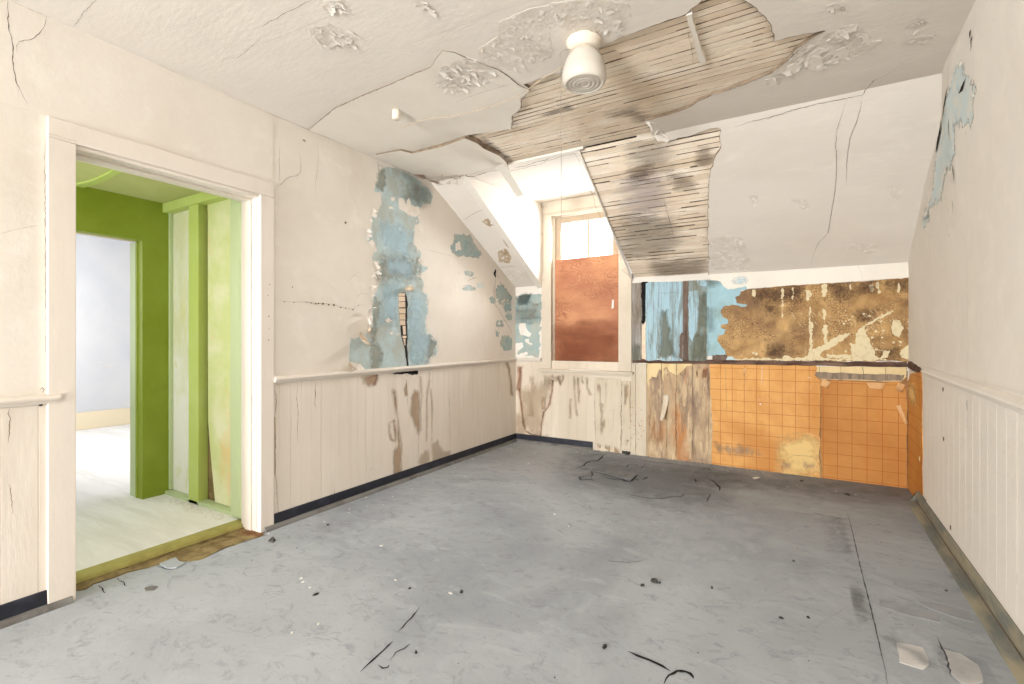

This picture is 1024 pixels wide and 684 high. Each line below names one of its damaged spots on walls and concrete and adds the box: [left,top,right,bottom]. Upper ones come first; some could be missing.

crack [7,1,47,104]
peeling [309,0,361,52]
flaking render [434,0,882,360]
crack [740,70,894,258]
peeling [923,61,977,229]
peeling [349,167,465,379]
damp [390,378,420,474]